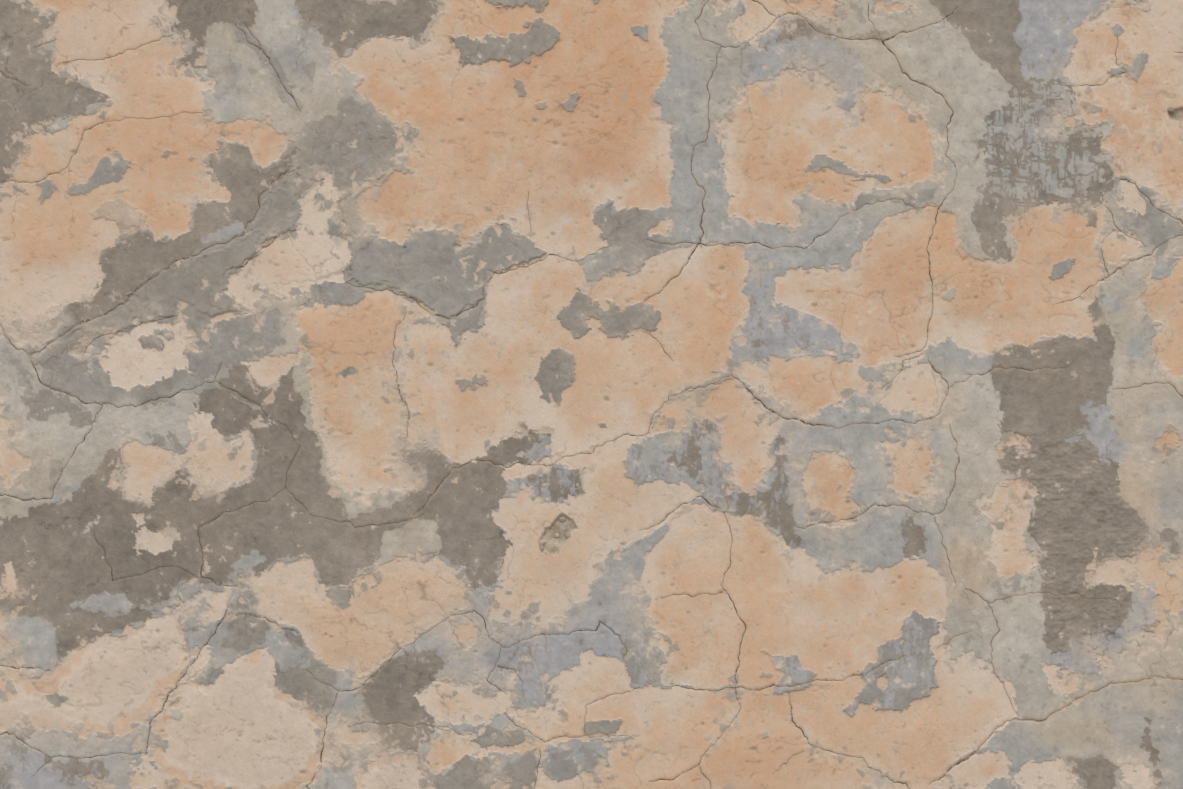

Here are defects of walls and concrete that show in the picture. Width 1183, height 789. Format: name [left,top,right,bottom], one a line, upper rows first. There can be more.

crack [0,501,298,773]
crack [235,1,300,110]
crack [0,168,654,528]
peeling [0,0,690,366]
crack [306,610,636,788]
peeling [0,243,1023,789]
peeling [733,0,955,126]
peeling [715,68,1111,420]
crack [646,0,1183,787]
peeling [848,0,1183,263]
peeling [968,296,1183,656]
peeling [1101,178,1183,380]